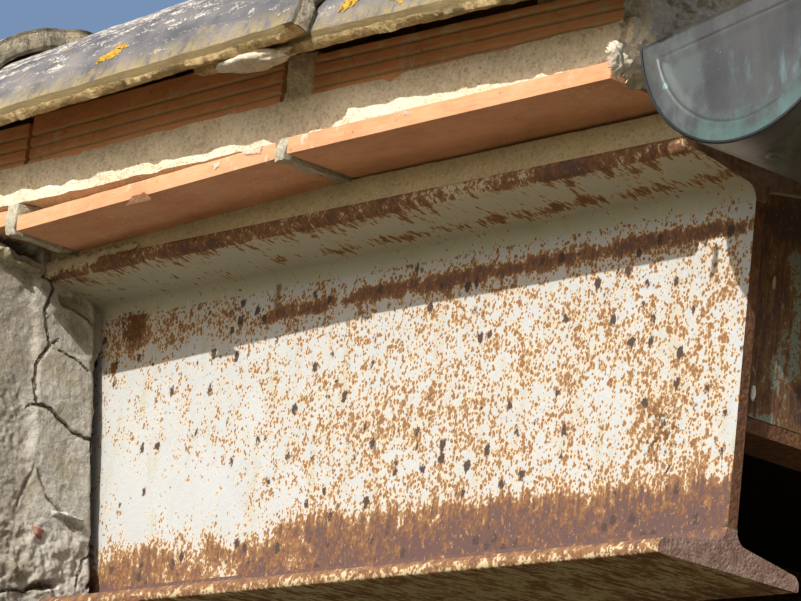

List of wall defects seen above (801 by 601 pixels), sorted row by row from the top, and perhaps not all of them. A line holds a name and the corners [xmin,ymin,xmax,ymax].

crack [32,276,95,588]
corrosion [635,402,684,467]